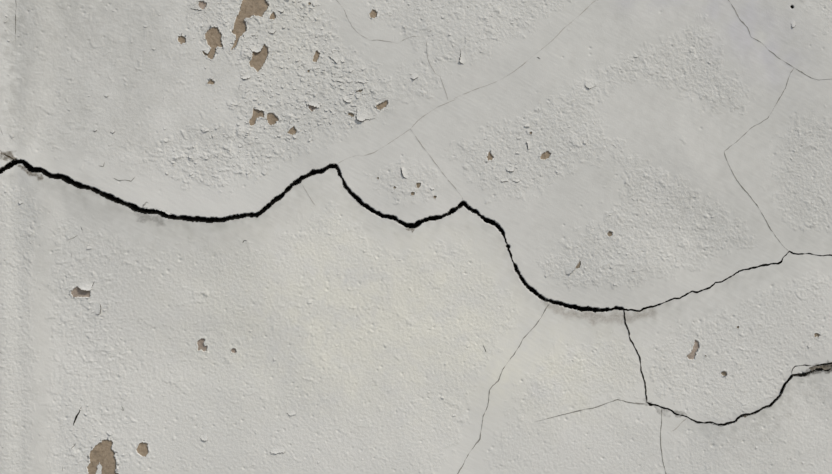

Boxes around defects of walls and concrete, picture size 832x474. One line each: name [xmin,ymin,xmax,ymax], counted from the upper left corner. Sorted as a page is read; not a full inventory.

peeling [367,7,380,22]
peeling [199,0,284,80]
crack [724,0,827,243]
peeling [68,281,101,315]
crack [0,111,832,474]
peeling [685,338,707,362]
peeling [85,437,121,474]